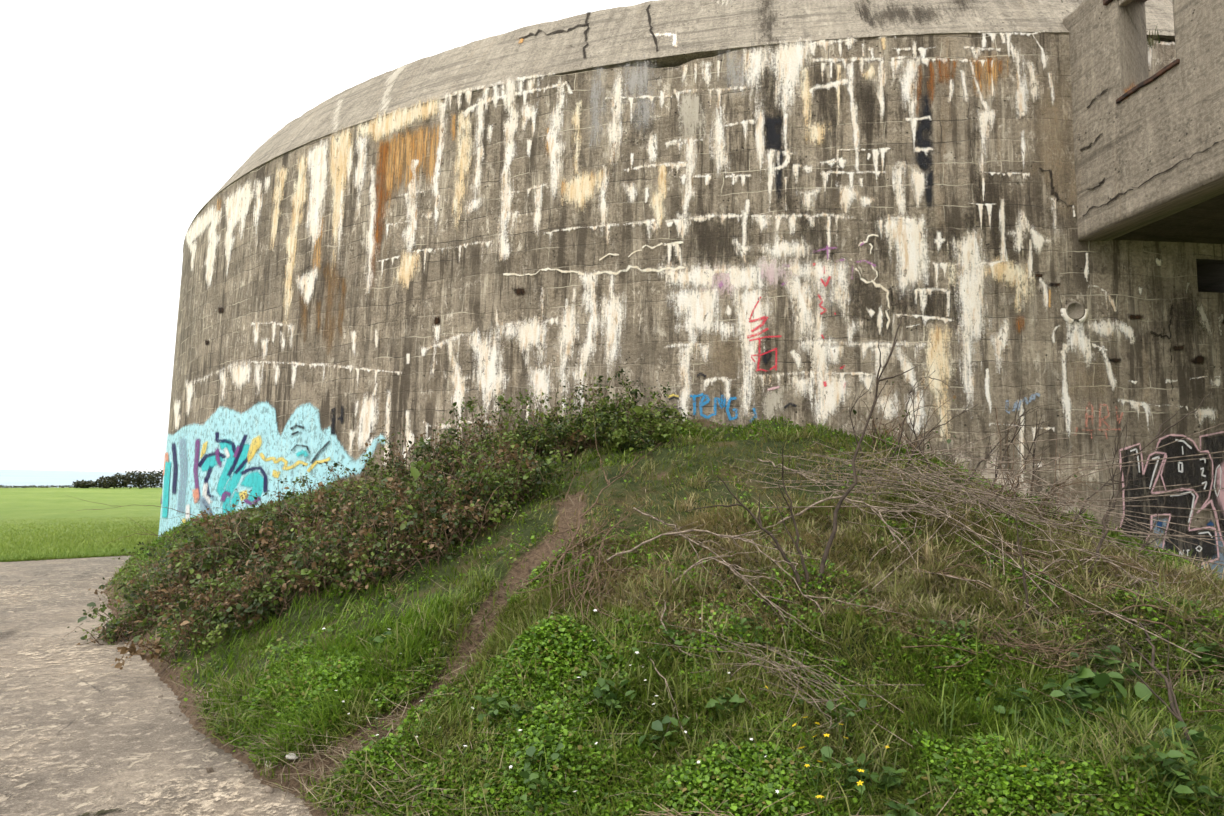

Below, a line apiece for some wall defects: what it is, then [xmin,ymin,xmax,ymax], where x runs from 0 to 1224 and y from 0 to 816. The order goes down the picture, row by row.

crack [519,12,591,58]
crack [646,5,677,51]
rust [972,57,1008,94]
crack [1080,88,1108,151]
rust [371,126,443,266]
crack [1039,139,1224,216]
water stain [174,0,1160,481]